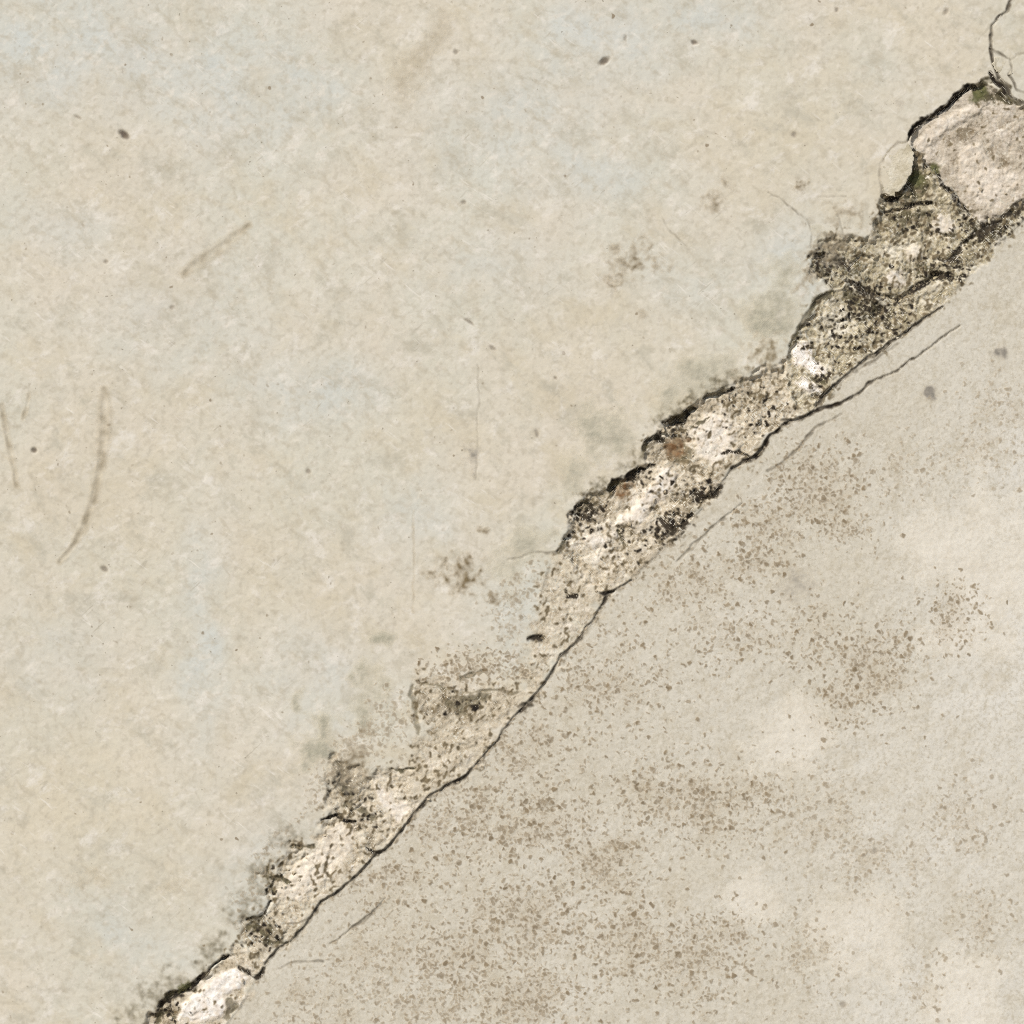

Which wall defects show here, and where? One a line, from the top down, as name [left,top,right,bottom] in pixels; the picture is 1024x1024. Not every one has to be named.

crack [989,0,1024,104]
spalling [145,72,1024,1024]
crack [729,306,948,472]
crack [264,584,626,964]